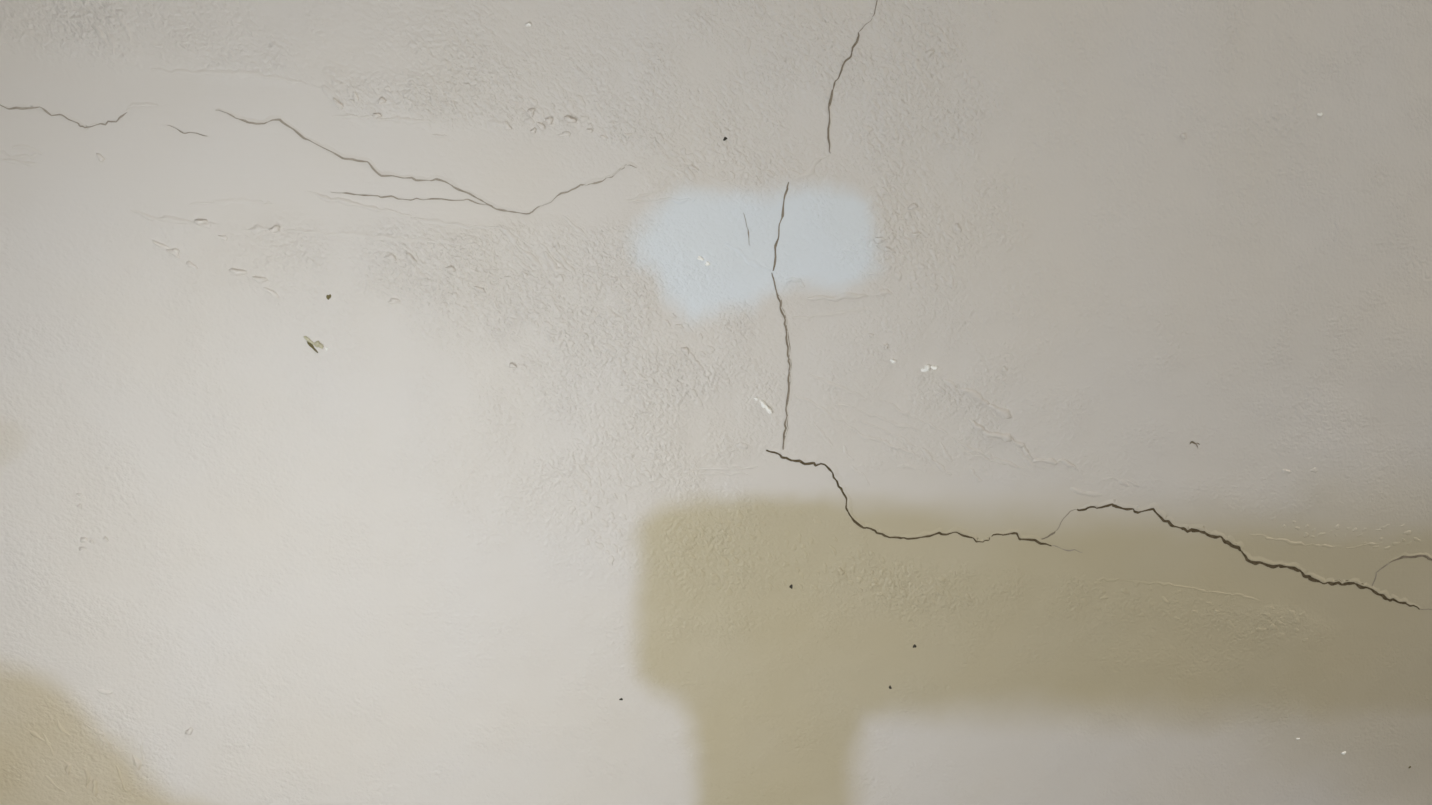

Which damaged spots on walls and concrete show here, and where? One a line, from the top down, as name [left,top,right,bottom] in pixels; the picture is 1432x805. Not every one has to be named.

crack [0,102,637,215]
crack [725,0,1432,610]